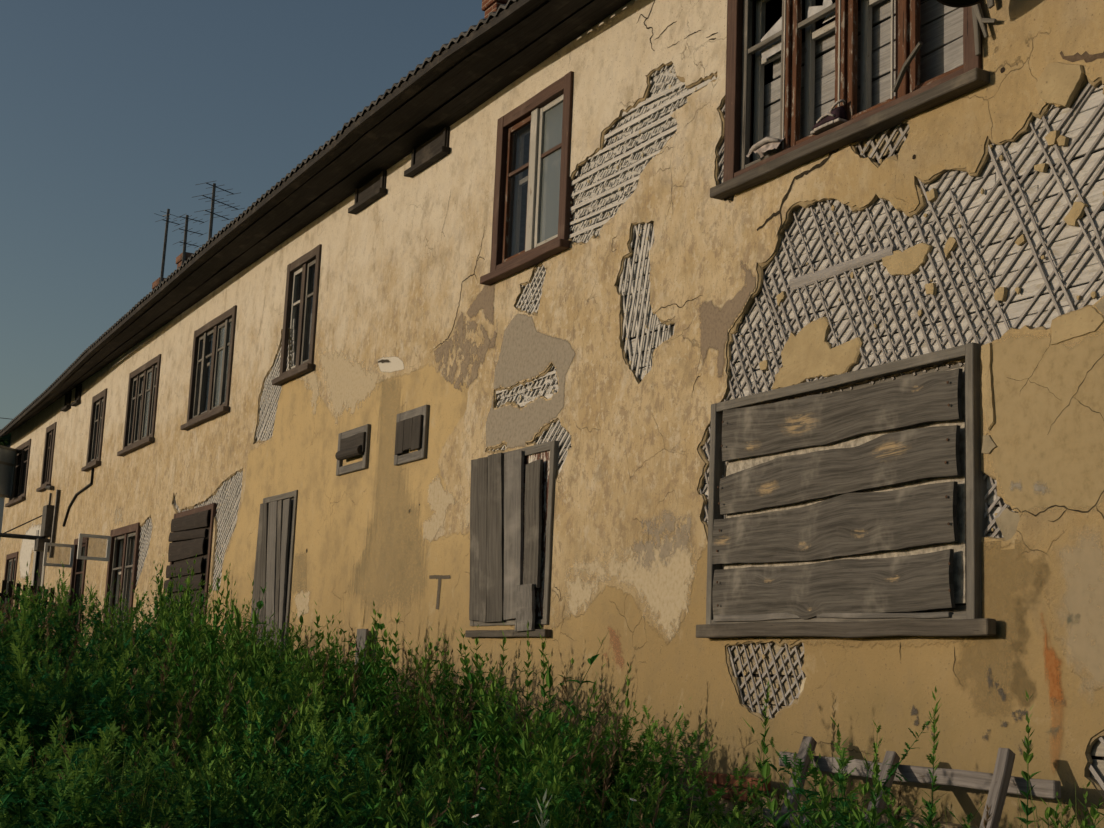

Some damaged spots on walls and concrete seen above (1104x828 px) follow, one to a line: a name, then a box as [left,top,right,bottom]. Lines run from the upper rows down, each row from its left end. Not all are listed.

crack [1060,51,1104,63]
spalling [569,64,717,243]
spalling [619,223,675,382]
crack [757,149,839,235]
spalling [699,80,1104,401]
flaking render [434,265,575,475]
crack [1007,336,1104,435]
crack [1007,490,1104,522]
spalling [728,642,806,719]
water stain [957,540,1041,714]
rust [1044,633,1062,767]
spalling [1088,737,1104,790]